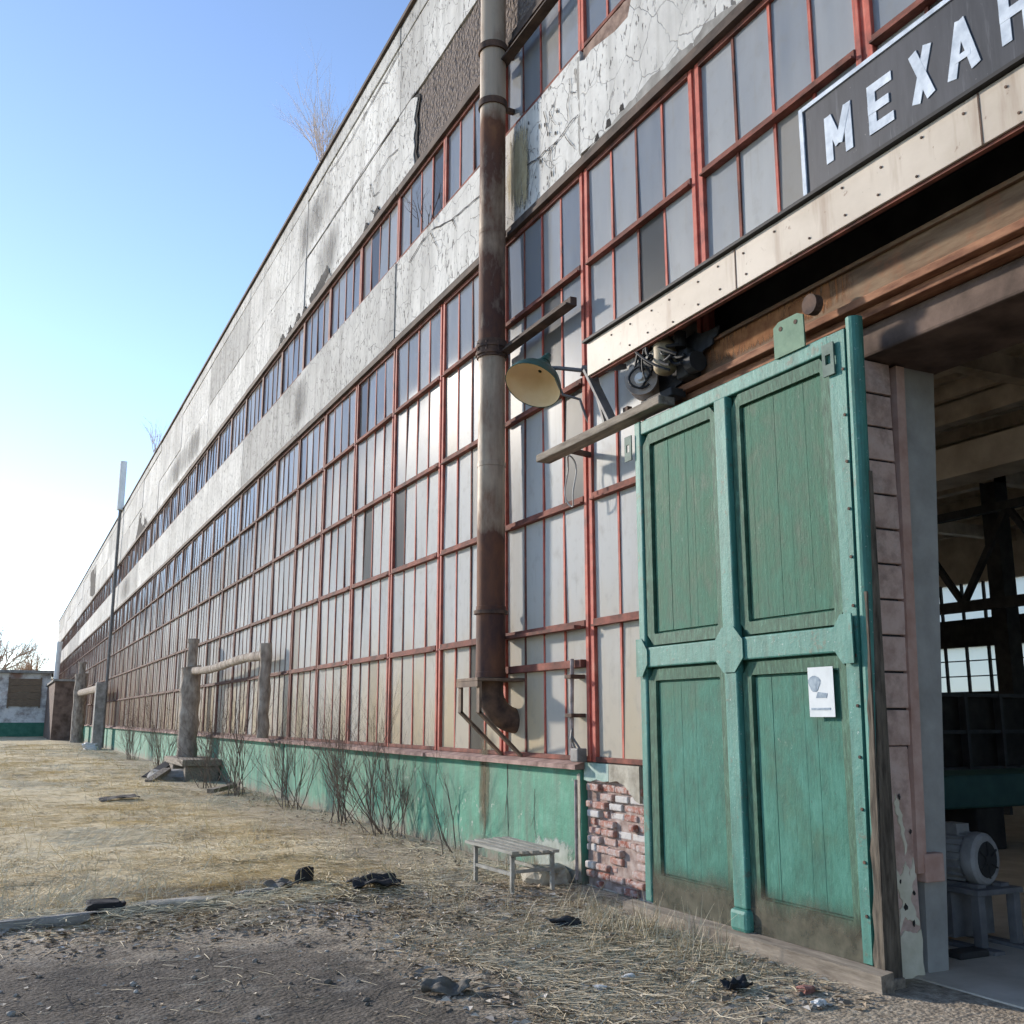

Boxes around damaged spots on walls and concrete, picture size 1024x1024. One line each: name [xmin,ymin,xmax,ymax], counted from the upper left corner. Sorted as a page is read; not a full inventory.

crack [279,52,415,299]
crack [409,195,480,263]
crack [527,54,581,190]
spalling [570,762,646,899]
peeling [893,794,925,979]